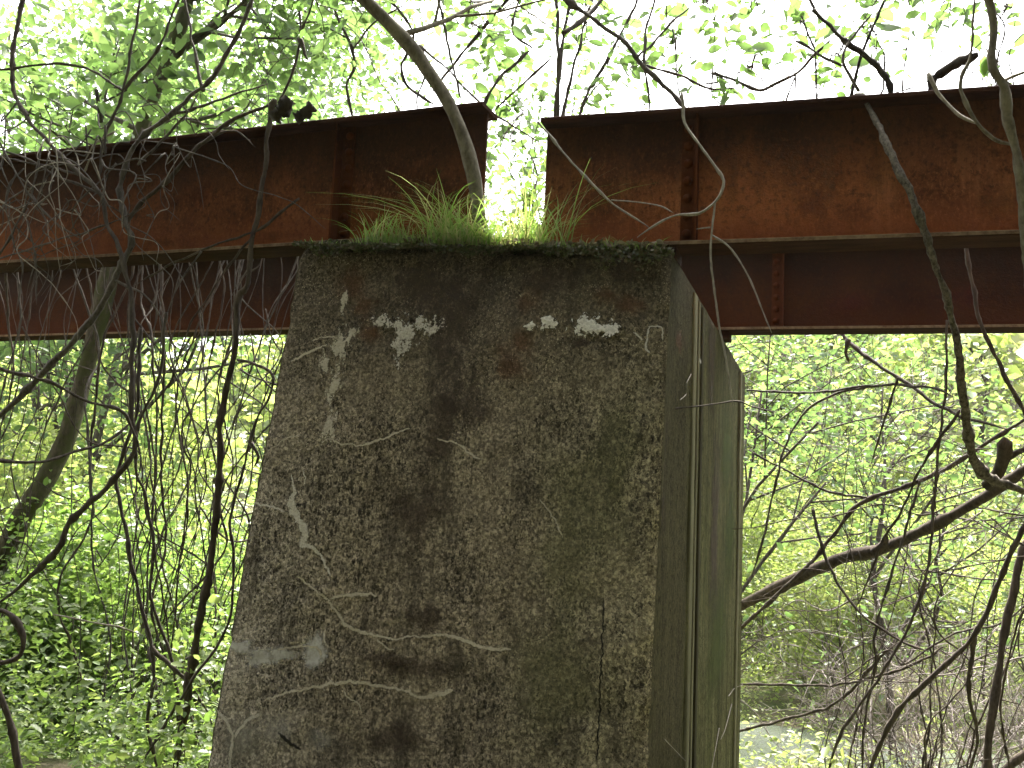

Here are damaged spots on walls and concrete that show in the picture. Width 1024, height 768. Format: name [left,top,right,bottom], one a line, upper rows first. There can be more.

peeling [371,311,447,370]
peeling [523,312,621,338]
crack [596,600,604,760]